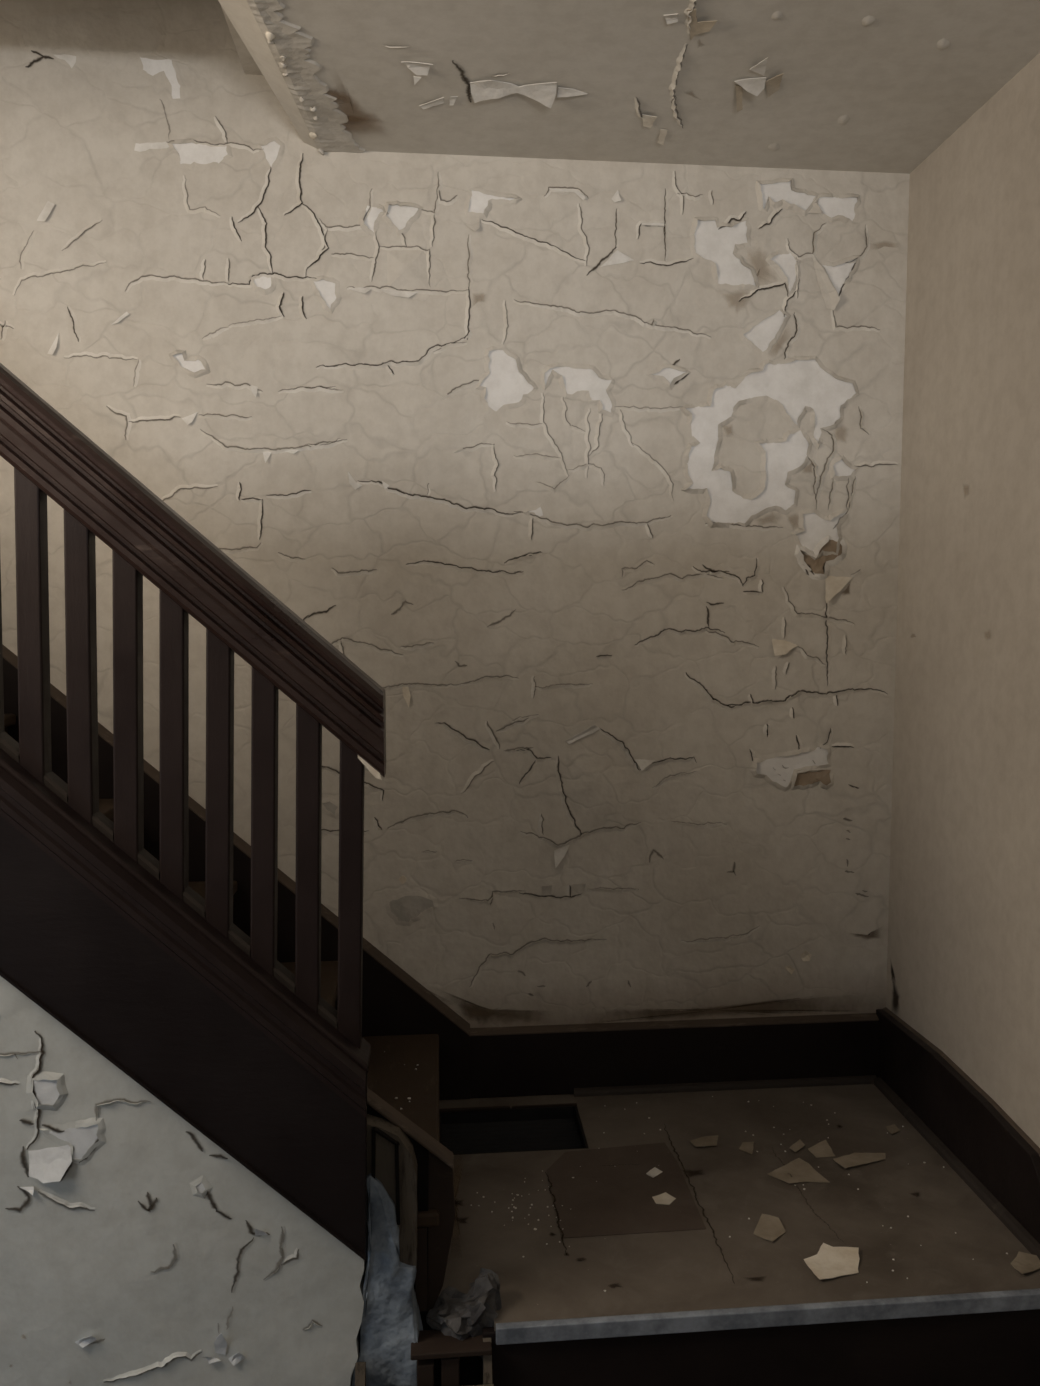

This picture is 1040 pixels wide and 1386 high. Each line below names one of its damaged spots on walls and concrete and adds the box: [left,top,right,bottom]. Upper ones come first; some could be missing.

spalling [246,0,366,155]
crack [452,60,510,102]
peeling [419,80,587,110]
crack [634,0,696,128]
peeling [476,345,617,417]
peeling [680,178,861,603]
crack [322,718,663,864]
spalling [750,742,834,792]
peeling [20,1071,106,1196]
crack [0,1031,151,1212]
crack [206,1191,299,1292]
crack [103,1350,202,1383]